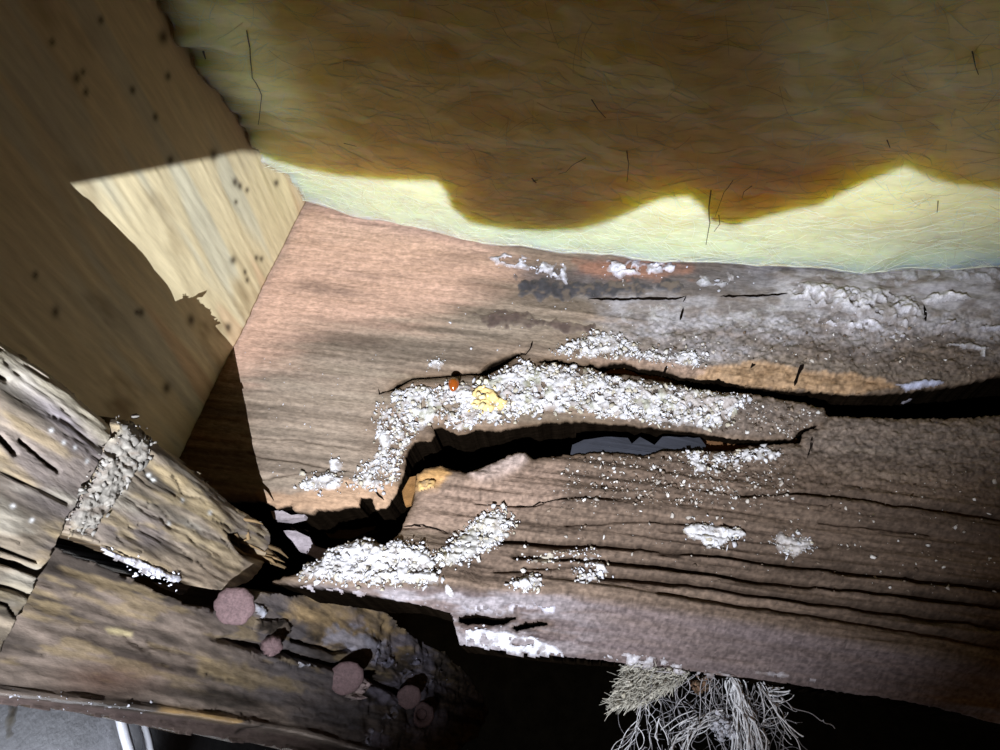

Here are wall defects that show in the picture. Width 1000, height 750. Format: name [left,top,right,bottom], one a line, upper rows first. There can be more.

damp [721,267,1000,357]
crack [794,364,804,386]
crack [935,410,999,420]
crack [529,440,571,459]
crack [424,448,501,473]
crack [515,498,567,507]
crack [237,492,445,594]
crack [152,579,191,595]
damp [300,584,367,597]